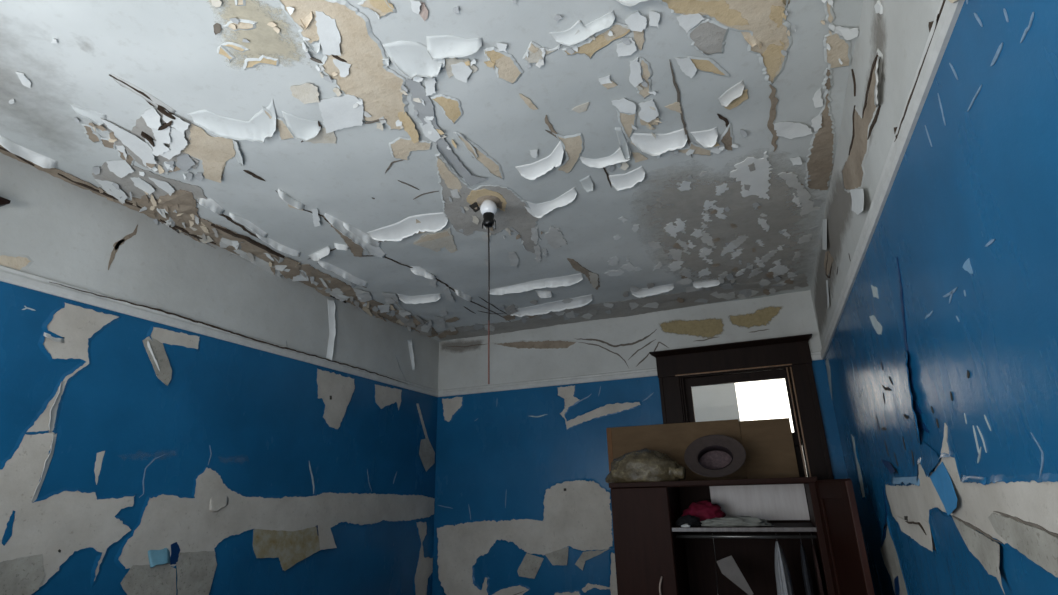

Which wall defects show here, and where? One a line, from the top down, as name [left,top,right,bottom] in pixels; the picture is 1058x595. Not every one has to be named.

flaking render [0,0,883,370]
crack [108,224,138,270]
crack [50,282,410,391]